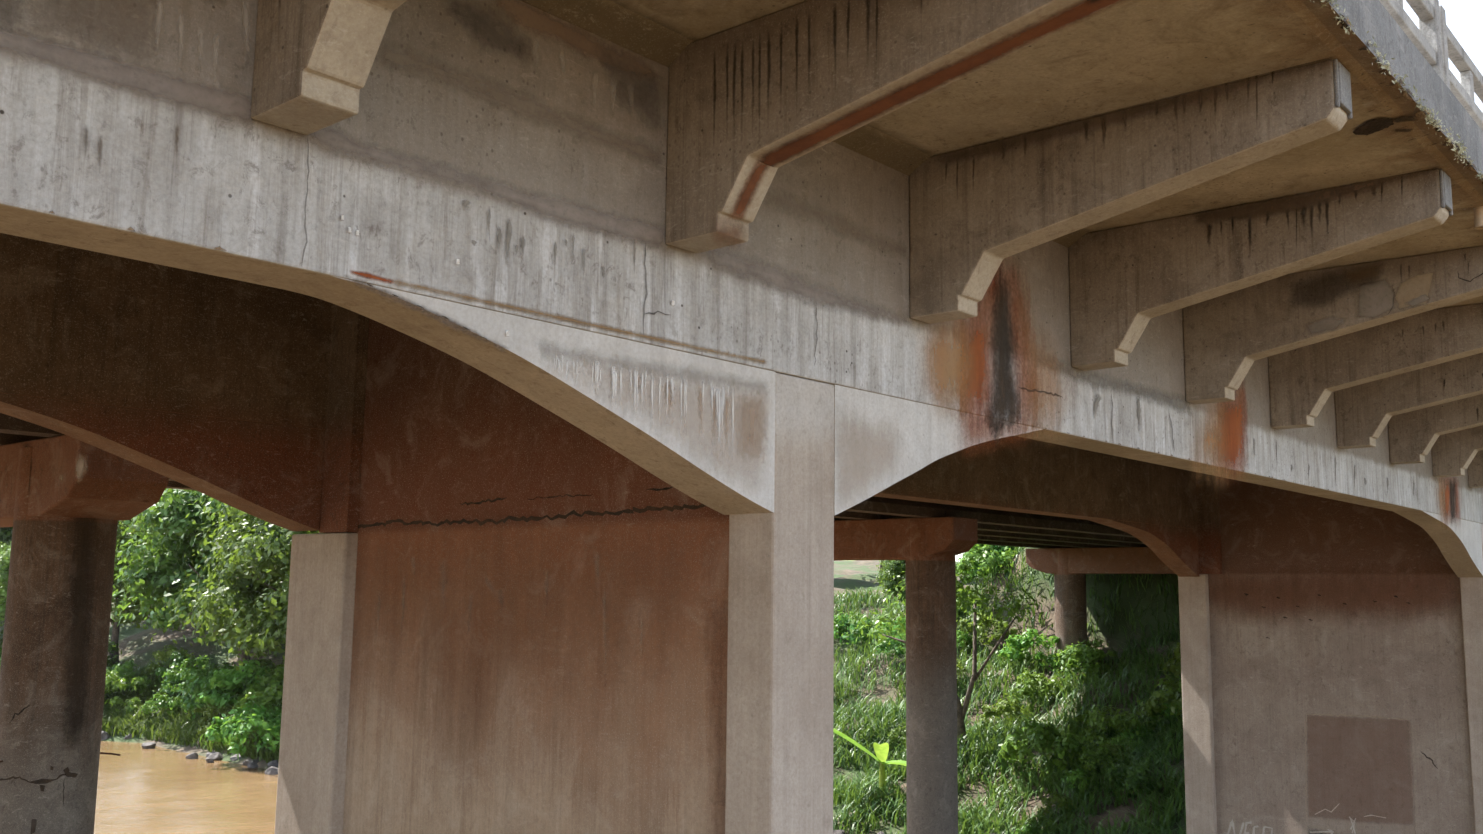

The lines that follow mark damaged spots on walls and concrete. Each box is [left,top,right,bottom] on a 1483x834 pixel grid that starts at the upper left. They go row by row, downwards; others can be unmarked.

damp [834,0,878,58]
damp [714,21,810,126]
corrosion [721,0,1123,235]
corrosion [352,271,393,283]
corrosion [929,274,1055,437]
damp [554,356,758,447]
corrosion [1204,388,1246,470]
crack [358,487,706,528]
crack [0,766,77,834]